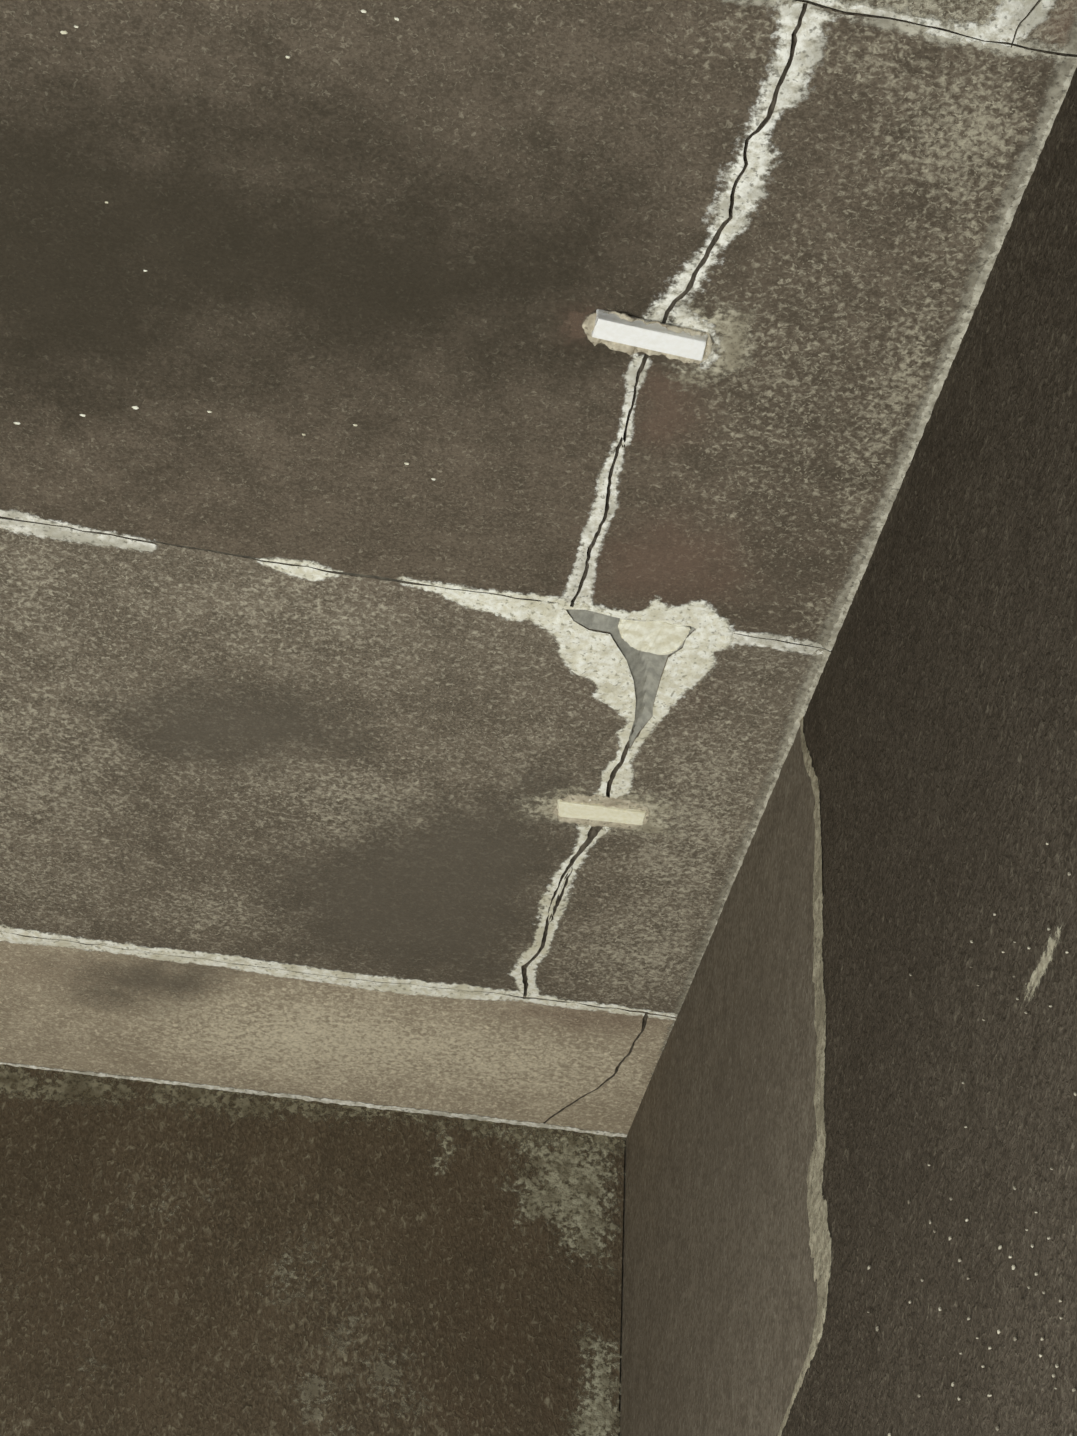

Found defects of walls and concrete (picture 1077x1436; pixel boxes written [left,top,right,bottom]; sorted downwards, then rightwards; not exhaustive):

crack [925,0,1055,47]
crack [561,0,837,607]
spalling [528,595,734,747]
crack [509,719,657,999]
crack [543,1012,648,1123]